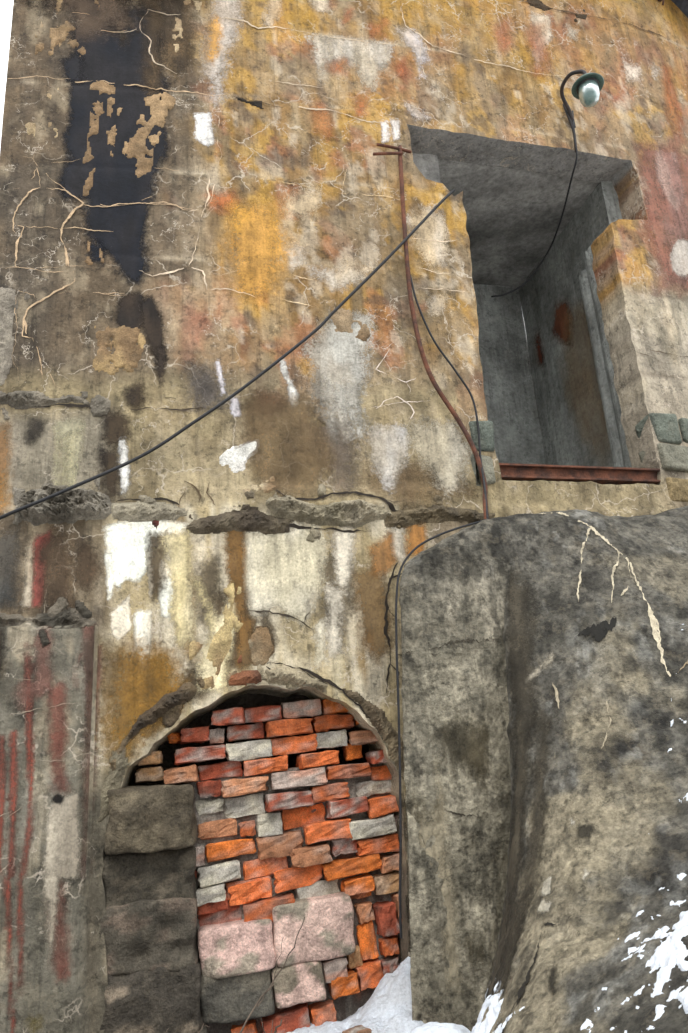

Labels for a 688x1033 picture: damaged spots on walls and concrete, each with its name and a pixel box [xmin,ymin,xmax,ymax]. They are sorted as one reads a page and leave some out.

flaking render [172,17,183,52]
flaking render [83,80,176,196]
leakage [28,0,243,383]
crack [5,9,382,408]
spalling [0,285,111,420]
leakage [99,383,145,500]
spalling [186,476,294,535]
spalling [0,597,96,648]
crack [539,512,688,676]
spalling [98,583,328,822]
spalling [343,688,405,779]
spalling [342,1025,372,1033]